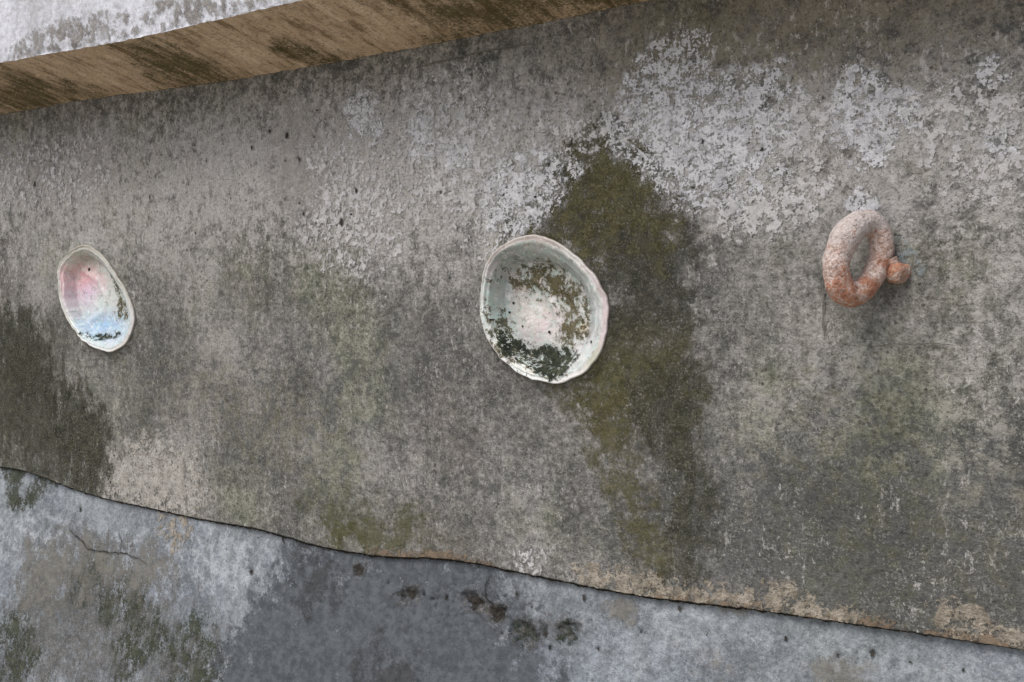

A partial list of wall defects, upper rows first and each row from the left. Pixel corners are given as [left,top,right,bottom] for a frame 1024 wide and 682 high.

leakage [0,309,213,517]
crack [0,467,1022,650]
leakage [576,358,723,592]
spalling [571,562,865,624]
spalling [929,596,1024,650]